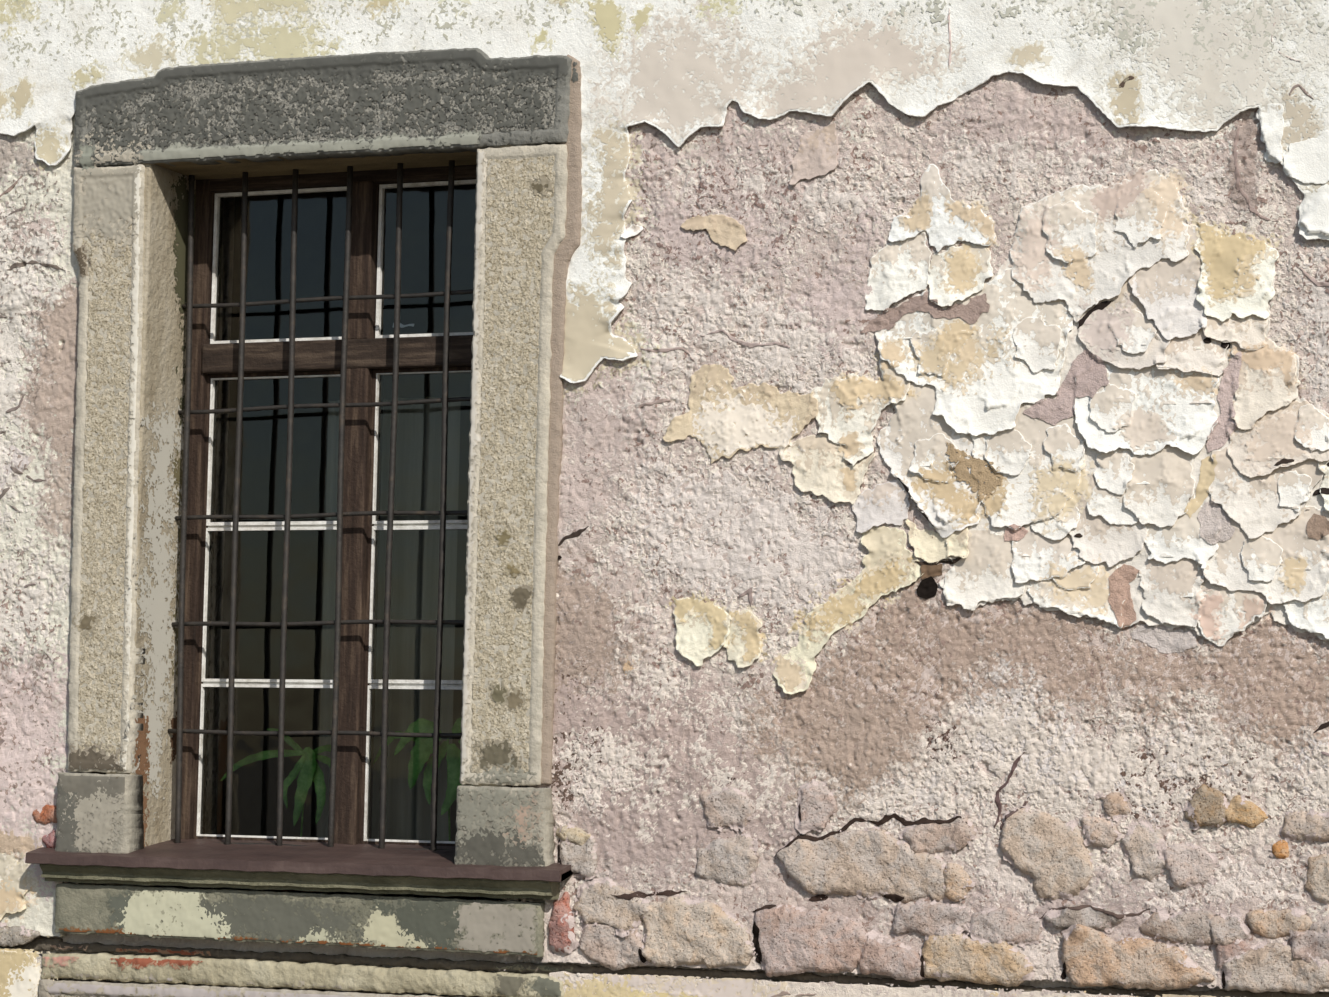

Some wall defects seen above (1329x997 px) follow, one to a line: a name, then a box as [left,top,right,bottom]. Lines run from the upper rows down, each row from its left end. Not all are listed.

spalling [996,73,1030,83]
peeling [558,84,1329,698]
spalling [0,115,80,848]
crack [774,752,1029,857]
spalling [0,853,66,996]
peeling [116,890,231,939]
peeling [297,926,342,943]
peeling [359,904,435,948]